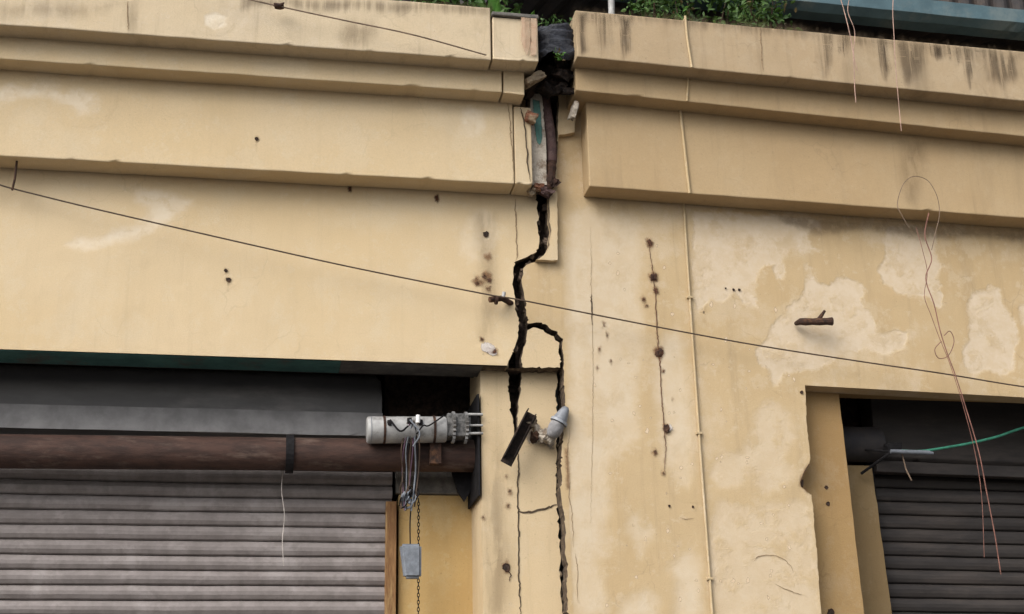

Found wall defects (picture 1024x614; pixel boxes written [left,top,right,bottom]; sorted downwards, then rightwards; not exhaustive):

peeling [521,17,574,145]
leakage [900,46,918,79]
leakage [990,55,1015,79]
corrosion [473,272,491,289]
crack [504,106,595,613]
corrosion [642,238,673,475]
peeling [558,195,1024,614]